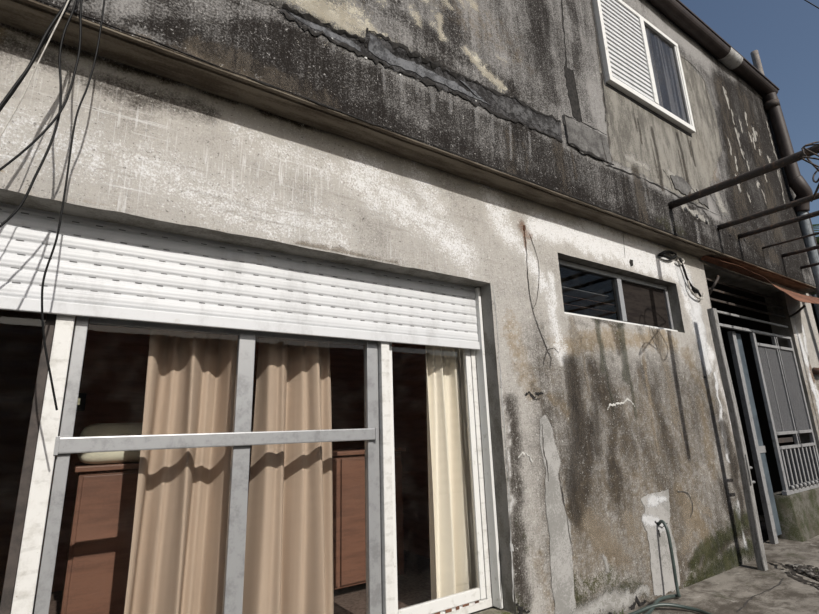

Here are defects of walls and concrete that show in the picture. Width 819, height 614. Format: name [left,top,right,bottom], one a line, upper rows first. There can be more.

flaking render [277,0,563,142]
crack [39,0,817,287]
water stain [651,127,664,191]
water stain [676,132,696,194]
water stain [714,77,785,263]
water stain [563,319,600,525]
water stain [595,319,608,375]
water stain [617,323,637,417]
water stain [719,419,744,524]